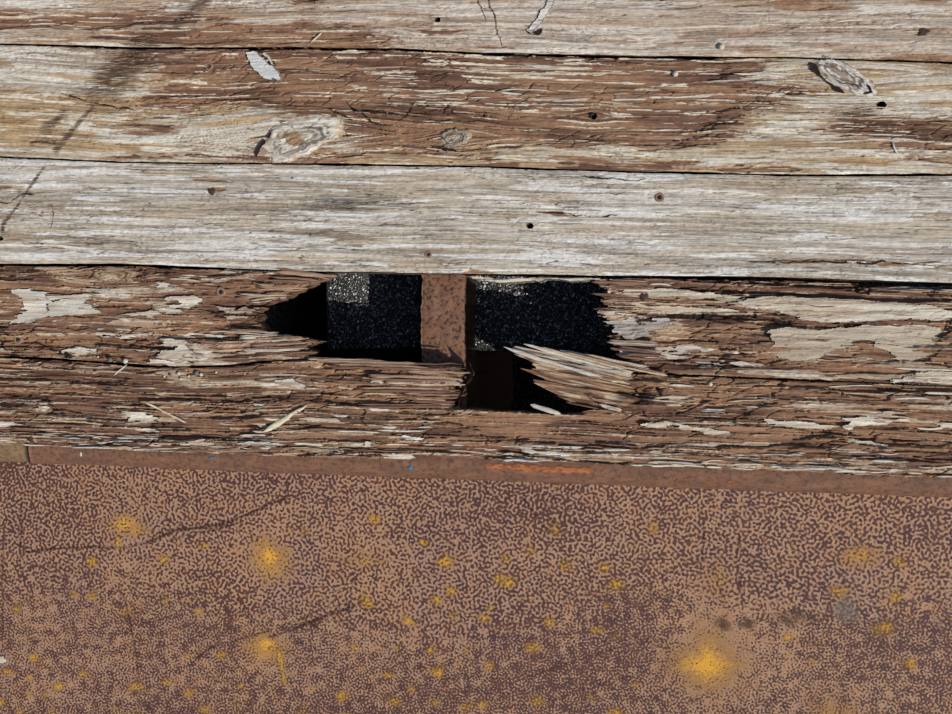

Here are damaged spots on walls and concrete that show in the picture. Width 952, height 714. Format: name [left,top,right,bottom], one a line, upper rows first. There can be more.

peeling [8,289,101,324]
peeling [119,282,205,319]
peeling [604,288,952,367]
peeling [90,332,226,368]
peeling [119,401,162,432]
peeling [640,421,733,436]
peeling [748,416,893,446]
rust [484,463,592,474]
rust [106,513,143,547]
rust [251,538,288,578]
rust [245,631,287,684]
rust [674,630,742,690]